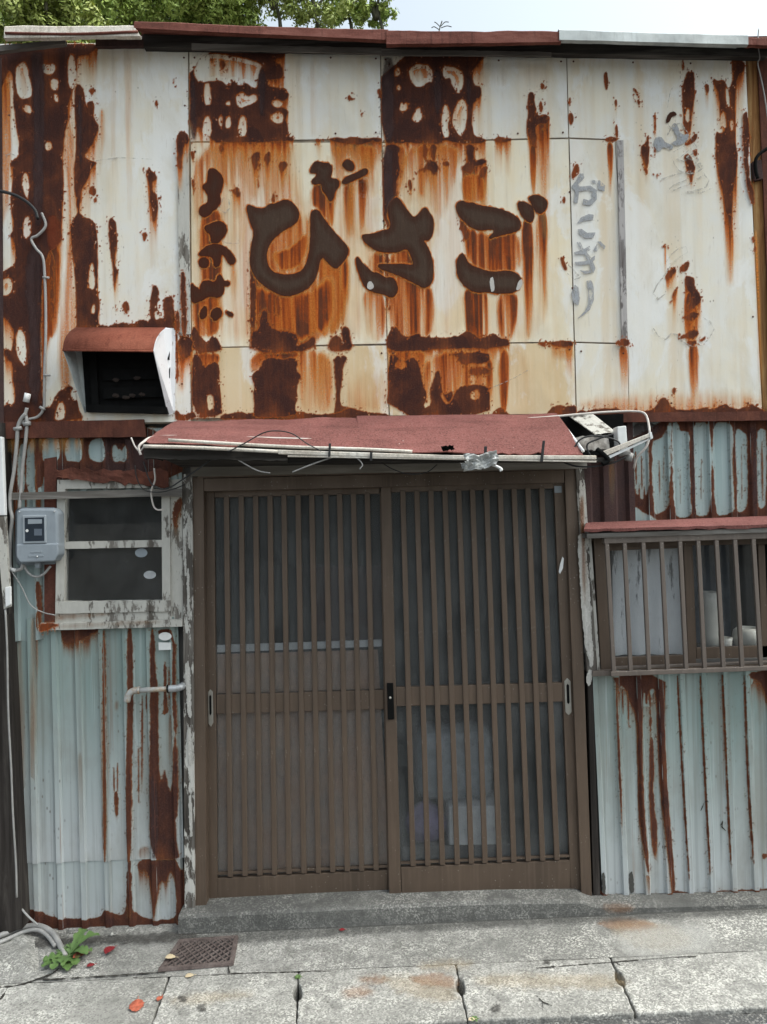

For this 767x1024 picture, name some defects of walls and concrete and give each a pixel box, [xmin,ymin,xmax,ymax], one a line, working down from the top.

corrosion [0,40,568,422]
corrosion [678,60,755,270]
corrosion [538,339,576,365]
corrosion [548,244,767,529]
peeling [578,534,594,686]
corrosion [28,581,185,930]
corrosion [613,675,690,895]